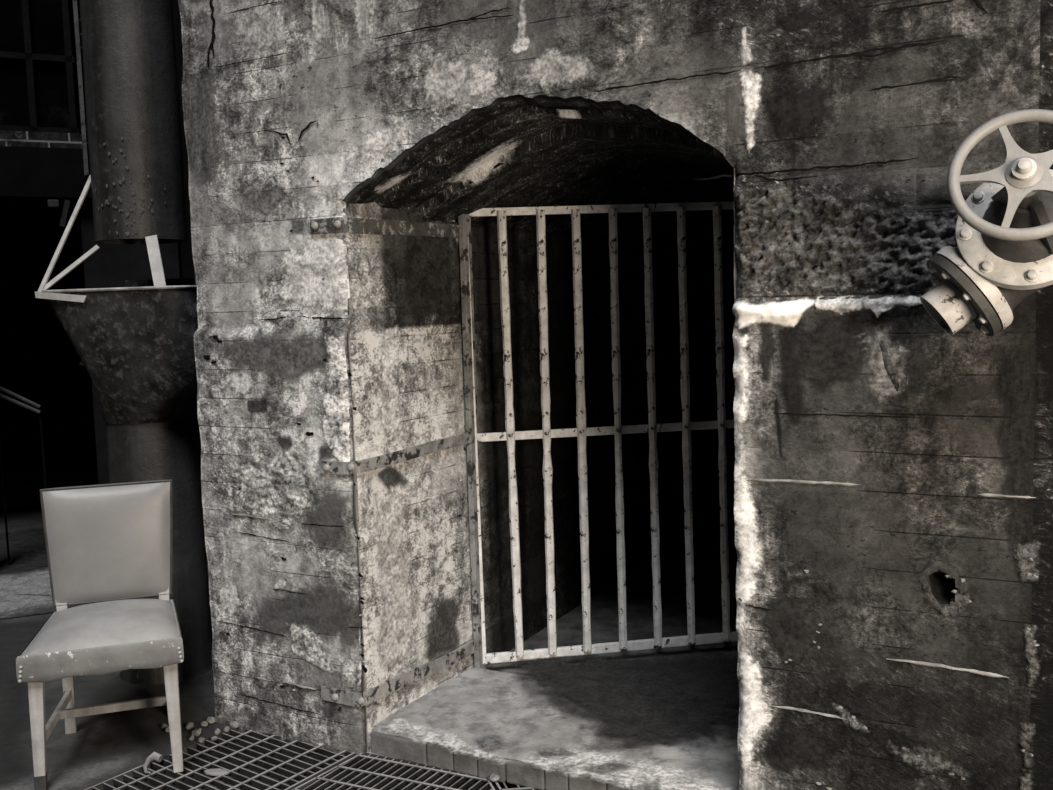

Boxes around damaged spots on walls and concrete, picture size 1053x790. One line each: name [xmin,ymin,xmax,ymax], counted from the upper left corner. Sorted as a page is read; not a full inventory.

crack [207,0,290,69]
water stain [511,0,530,54]
water stain [517,50,594,91]
water stain [720,28,826,148]
spalling [734,183,958,294]
water stain [515,295,930,790]
spalling [923,574,972,617]